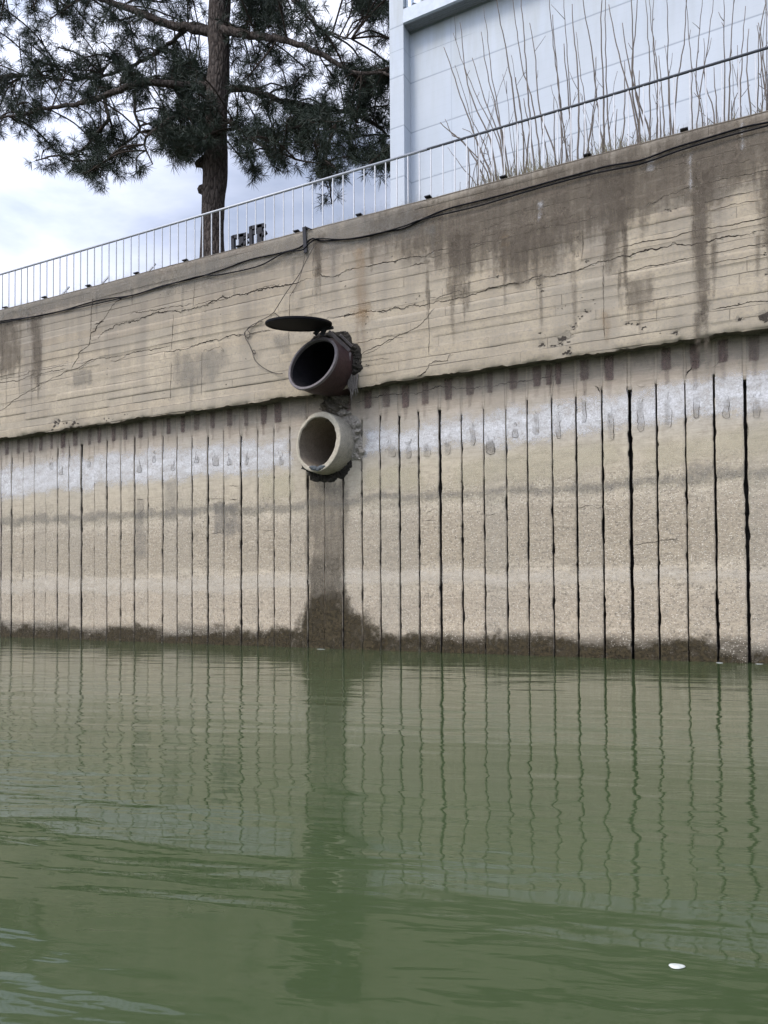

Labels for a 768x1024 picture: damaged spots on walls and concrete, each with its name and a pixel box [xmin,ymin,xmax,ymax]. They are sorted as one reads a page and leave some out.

crack [0,211,516,411]
crack [335,160,768,403]
leakage [371,122,768,320]
leakage [366,374,768,452]